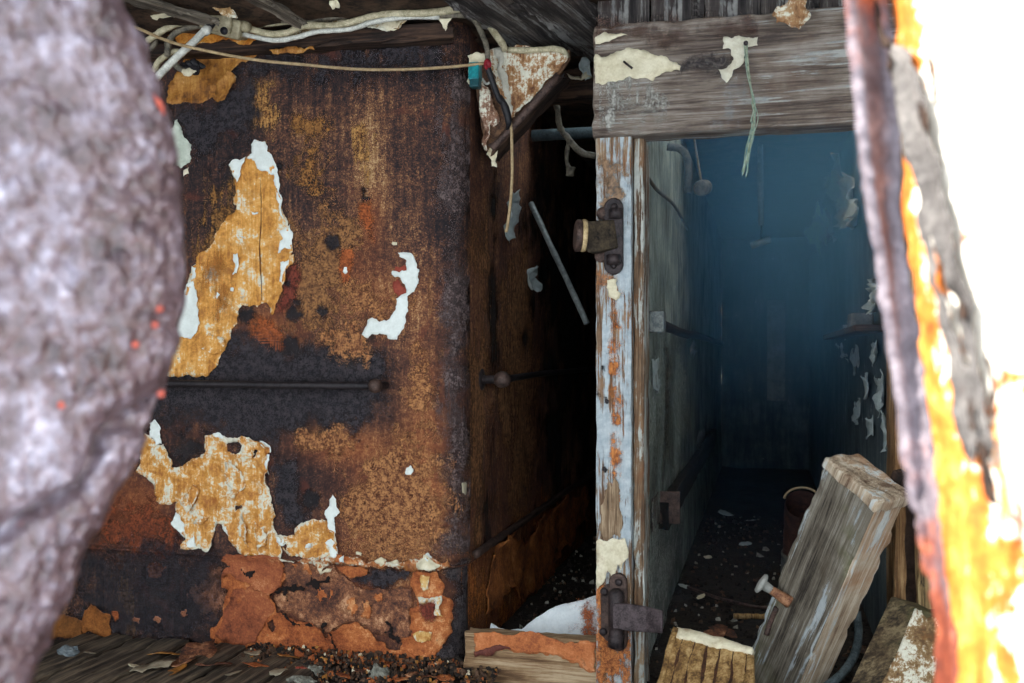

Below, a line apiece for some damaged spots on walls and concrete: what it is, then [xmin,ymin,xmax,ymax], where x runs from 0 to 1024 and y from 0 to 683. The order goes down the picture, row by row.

peeling [167,33,257,105]
peeling [566,32,681,128]
peeling [718,35,758,83]
peeling [172,120,191,176]
rust [191,176,236,257]
peeling [168,139,294,377]
rust [248,80,491,568]
peeling [362,242,419,340]
rust [596,270,622,484]
peeling [136,419,452,572]
peeling [596,470,629,589]
rust [580,585,631,683]